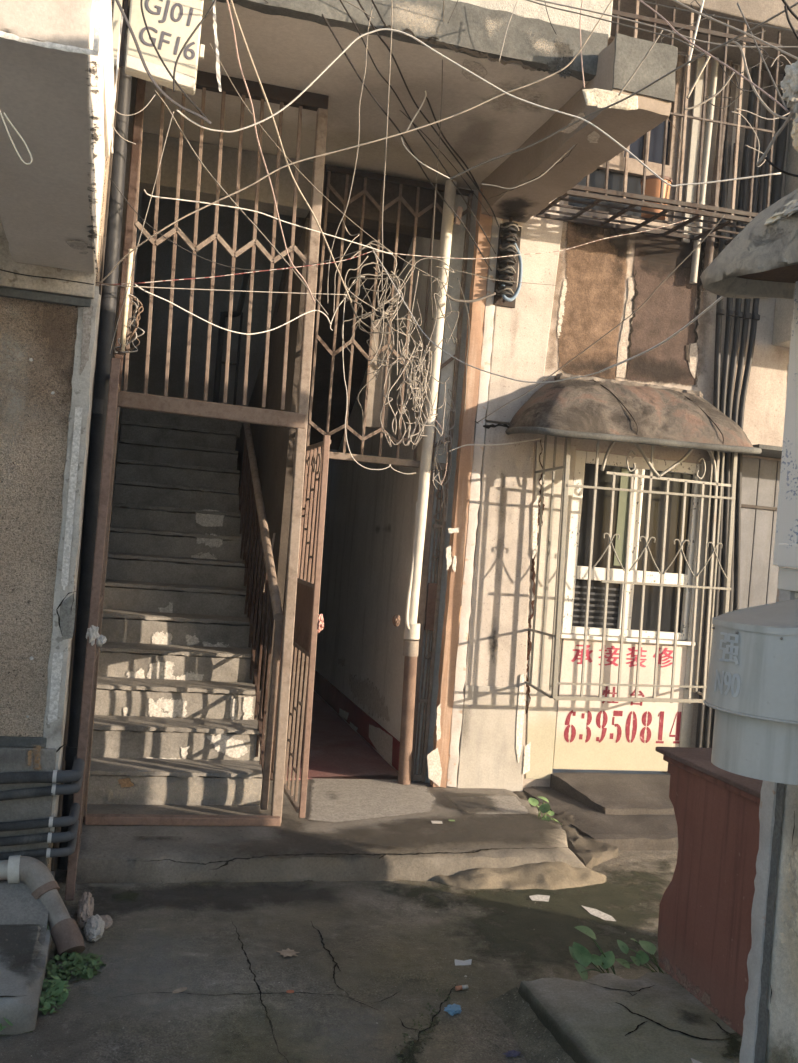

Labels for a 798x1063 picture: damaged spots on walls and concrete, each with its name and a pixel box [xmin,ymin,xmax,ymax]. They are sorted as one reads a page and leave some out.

peeling [190,509,224,560]
crack [525,440,545,714]
peeling [152,631,173,645]
peeling [126,661,204,681]
peeling [148,697,187,718]
peeling [230,696,253,720]
peeling [206,734,248,758]
crack [134,847,578,869]
crack [106,921,456,1063]
crack [587,982,730,1040]